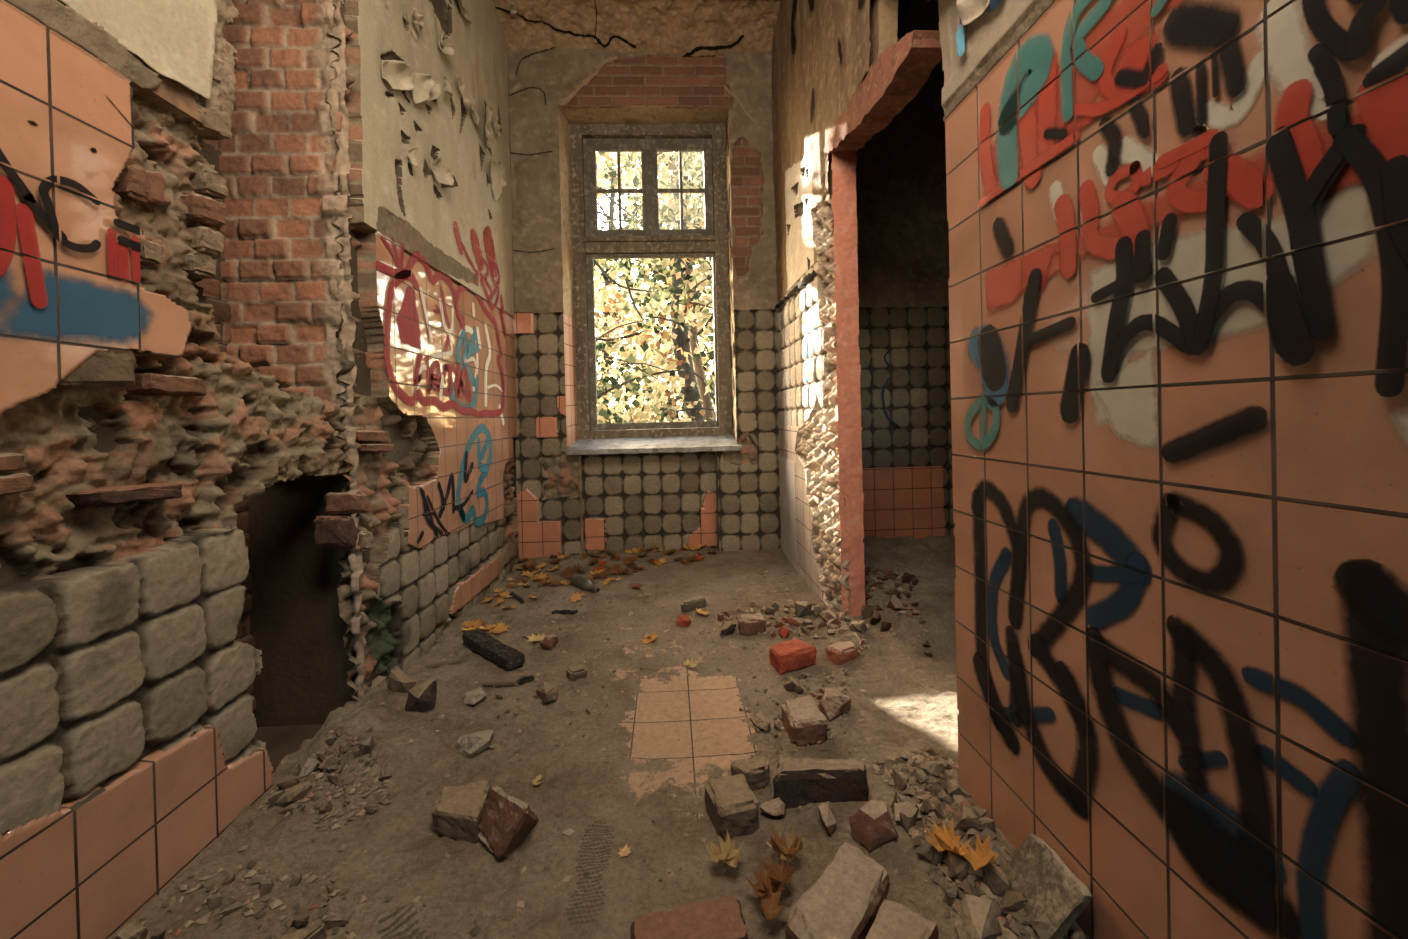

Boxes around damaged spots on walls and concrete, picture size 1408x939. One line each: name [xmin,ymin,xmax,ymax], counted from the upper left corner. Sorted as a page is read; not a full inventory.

crack [495,0,637,105]
crack [683,34,744,57]
peeling [956,0,990,26]
peeling [0,0,850,834]